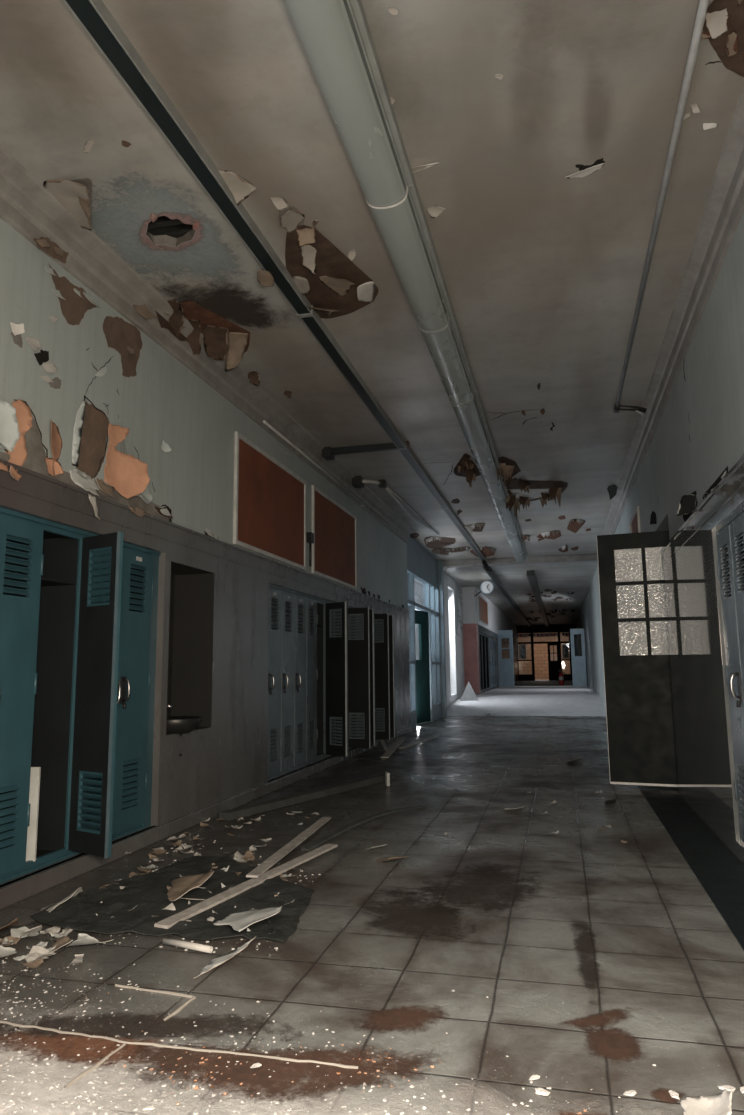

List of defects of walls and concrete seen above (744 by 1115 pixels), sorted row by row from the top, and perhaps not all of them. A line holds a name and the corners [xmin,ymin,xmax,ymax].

peeling [701,0,744,77]
peeling [33,237,260,386]
damp [91,177,273,328]
peeling [257,268,274,287]
peeling [270,196,378,319]
peeling [10,322,61,389]
peeling [0,395,173,522]
peeling [497,456,591,552]
rust [0,1023,429,1102]
rust [351,1006,449,1032]
rust [564,1009,642,1061]